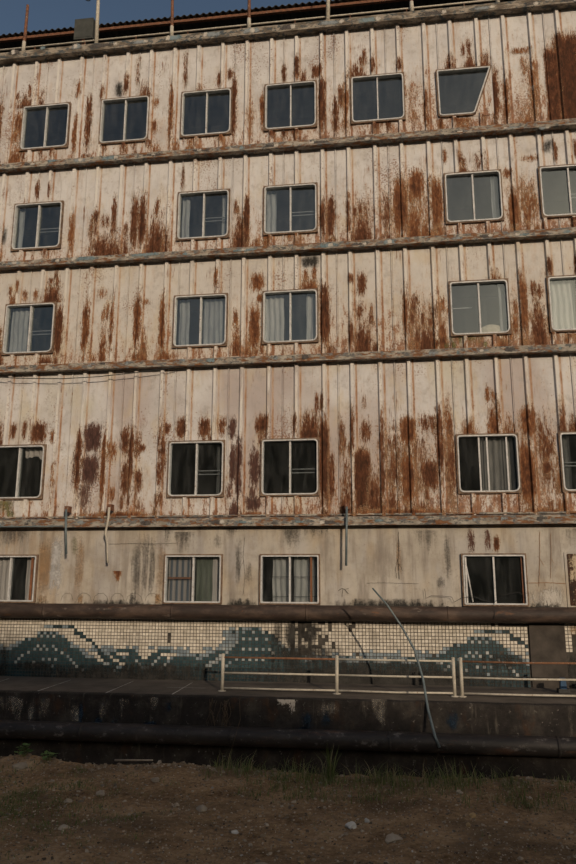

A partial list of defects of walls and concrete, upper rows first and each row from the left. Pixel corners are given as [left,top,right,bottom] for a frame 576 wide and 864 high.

corrosion [396,31,576,130]
corrosion [85,190,170,256]
corrosion [319,167,446,242]
corrosion [0,418,54,445]
corrosion [72,415,186,519]
corrosion [198,414,269,517]
corrosion [292,390,477,516]
corrosion [485,385,576,514]
water stain [80,544,160,604]
spalling [529,586,574,607]
peeling [568,554,576,582]
spalling [277,699,298,713]